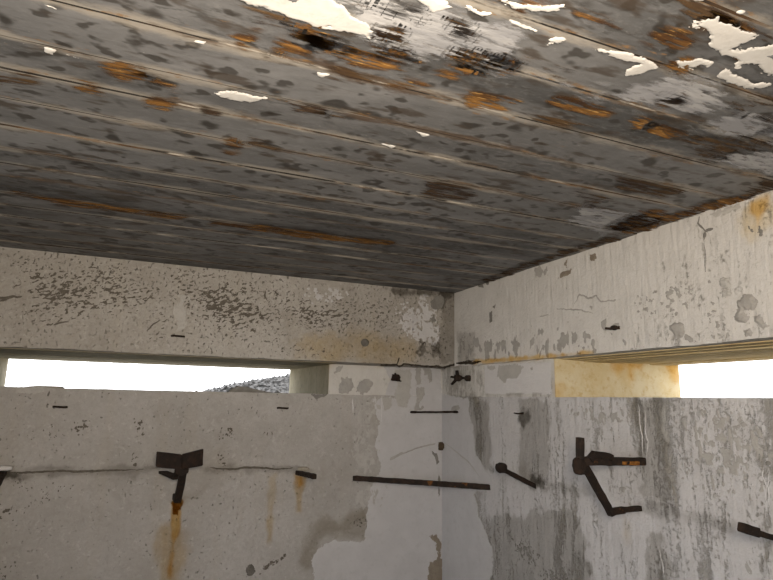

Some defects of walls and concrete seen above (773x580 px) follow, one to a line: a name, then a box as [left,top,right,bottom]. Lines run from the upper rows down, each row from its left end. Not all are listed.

peeling [241,0,373,40]
peeling [418,0,453,13]
peeling [465,5,492,17]
peeling [501,0,565,12]
peeling [597,48,661,76]
peeling [677,58,714,71]
peeling [688,16,773,89]
crack [0,294,22,302]
peeling [634,276,693,317]
peeling [530,327,597,358]
crack [381,358,481,369]
peeling [459,333,533,383]